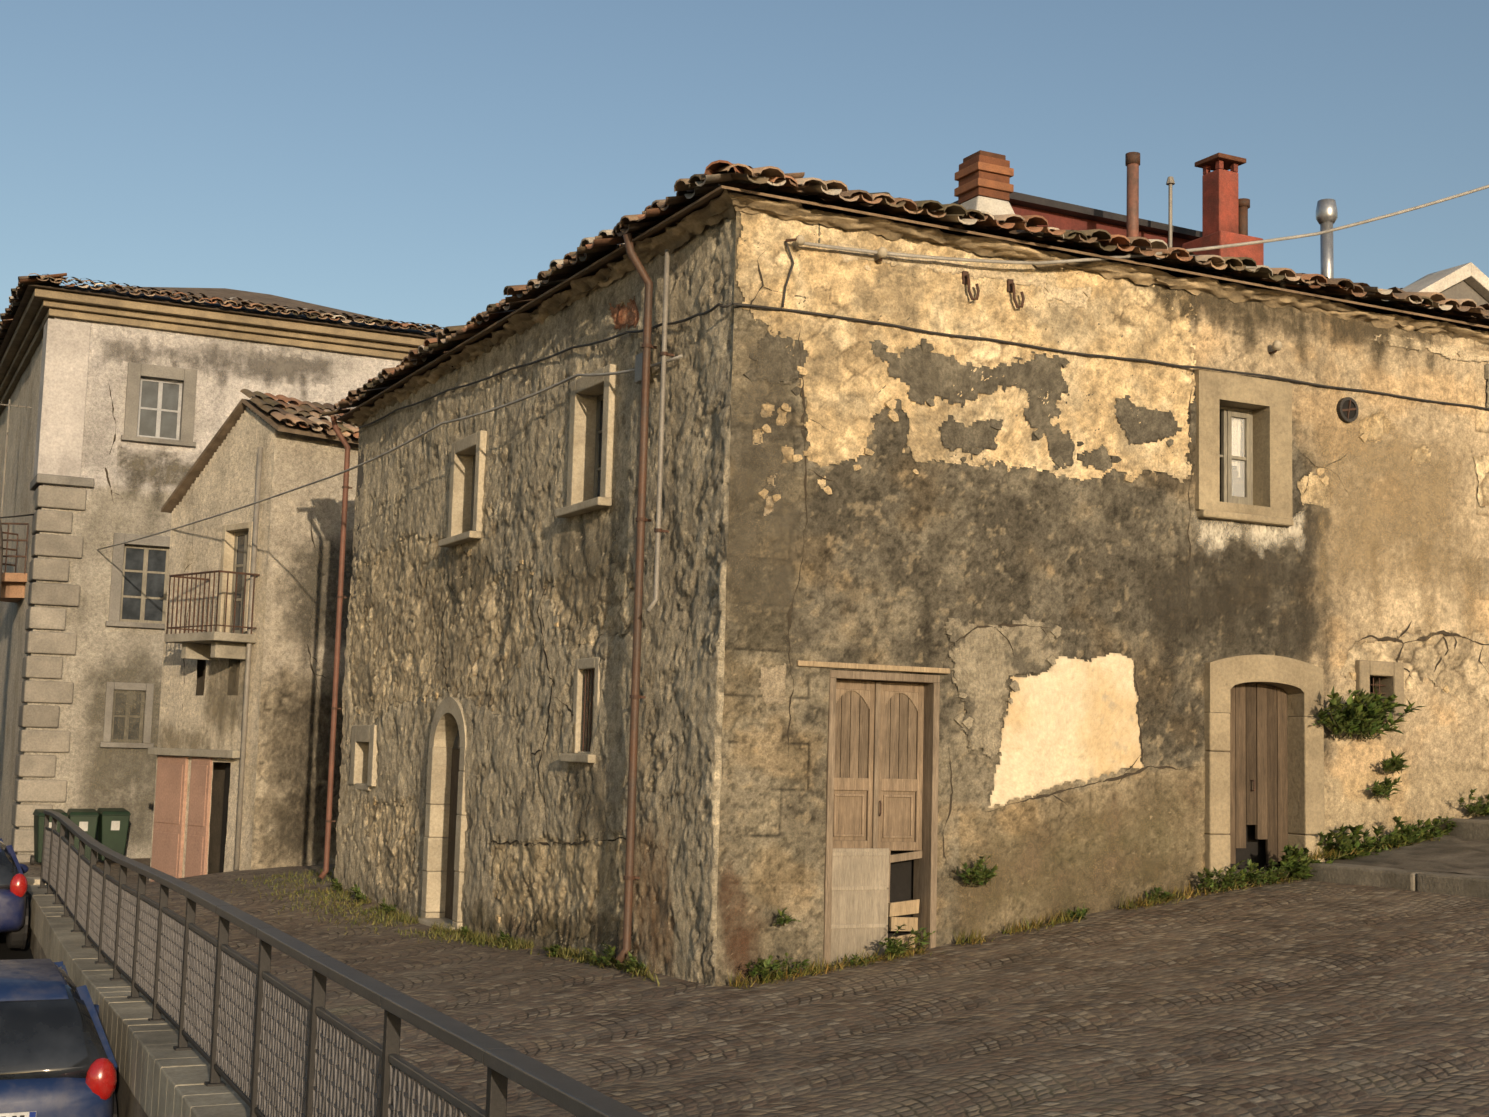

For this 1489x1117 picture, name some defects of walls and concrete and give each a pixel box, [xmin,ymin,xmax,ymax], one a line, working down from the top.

flaking render [736,211,1198,516]
flaking render [1297,468,1333,509]
flaking render [944,614,1062,759]
crack [1356,621,1489,677]